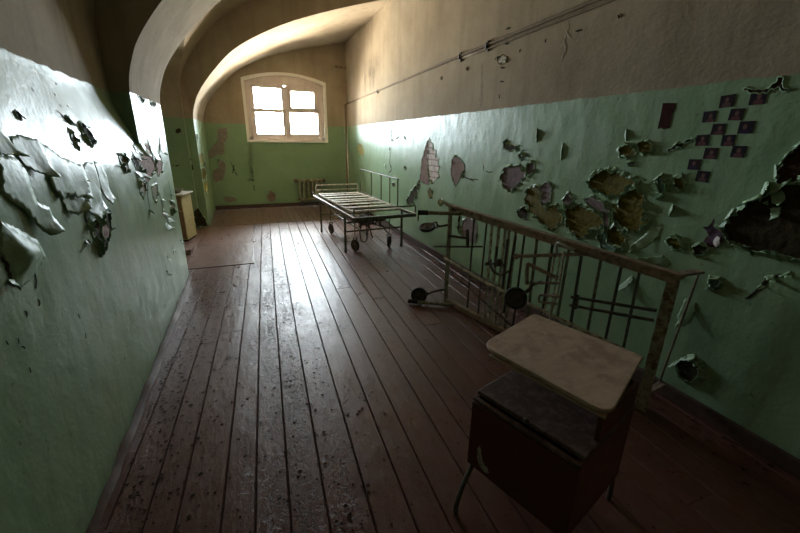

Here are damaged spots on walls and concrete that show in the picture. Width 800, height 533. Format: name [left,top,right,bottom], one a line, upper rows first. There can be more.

peeling [742,75,792,95]
peeling [0,131,116,258]
peeling [65,114,98,151]
peeling [116,137,169,204]
peeling [162,200,178,231]
flaking render [196,127,228,194]
flaking render [406,138,443,206]
flaking render [450,155,465,187]
peeling [498,131,710,267]
flaking render [715,141,800,281]
peeling [668,354,707,385]